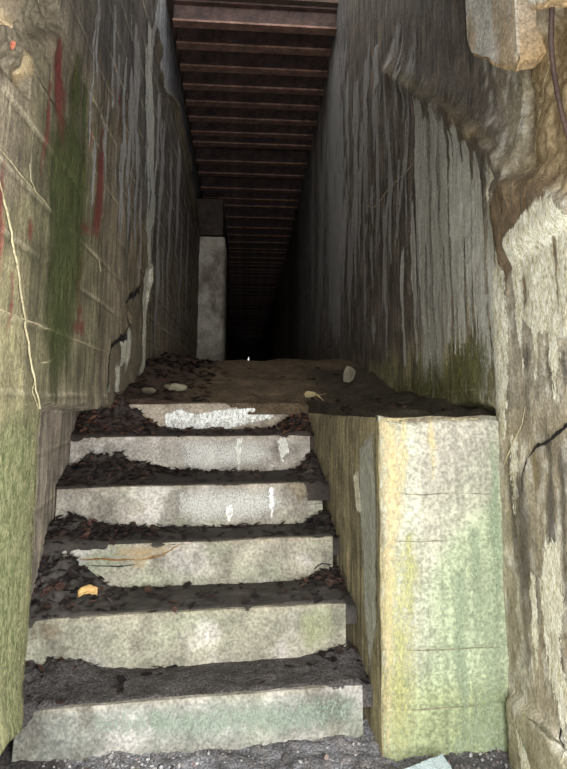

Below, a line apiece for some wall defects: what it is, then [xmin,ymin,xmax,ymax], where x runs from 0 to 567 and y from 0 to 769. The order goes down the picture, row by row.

crack [0,149,52,212]
crack [0,182,142,409]
damp [43,38,104,347]
damp [108,322,133,394]
damp [139,21,157,375]
damp [400,93,567,758]
crack [504,406,567,491]